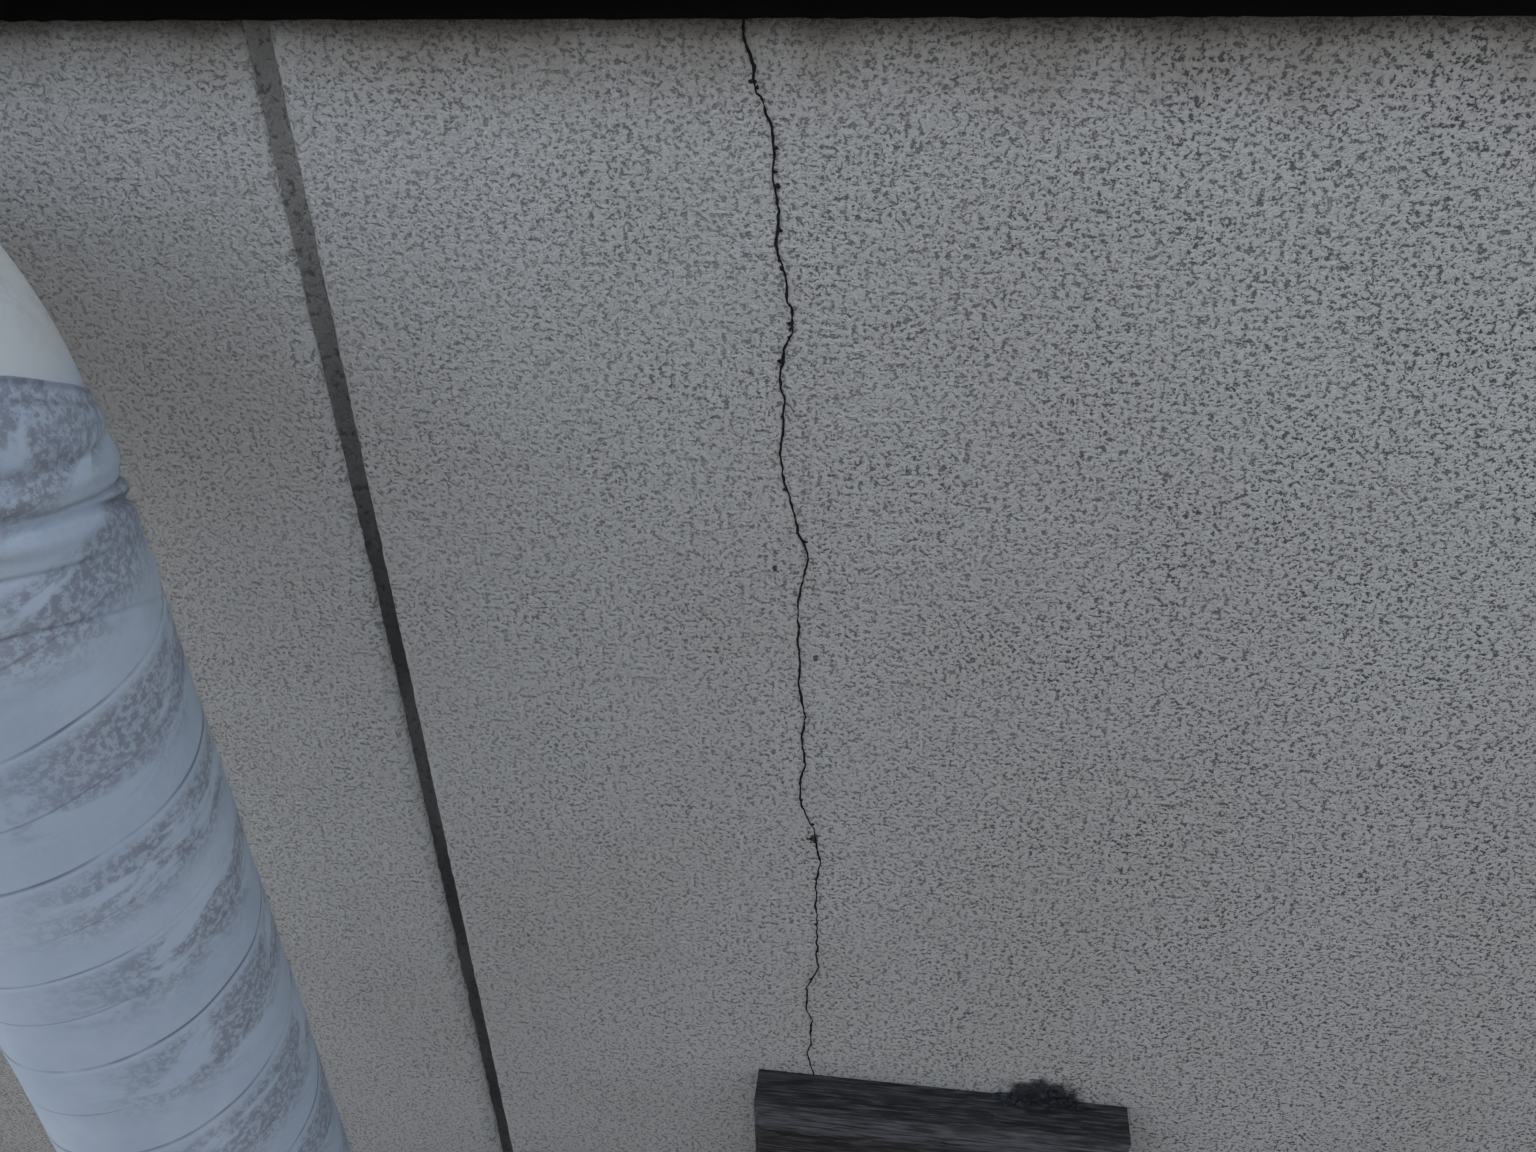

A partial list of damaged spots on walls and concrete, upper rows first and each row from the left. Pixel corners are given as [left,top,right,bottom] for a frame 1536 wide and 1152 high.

crack [742,19,821,1075]